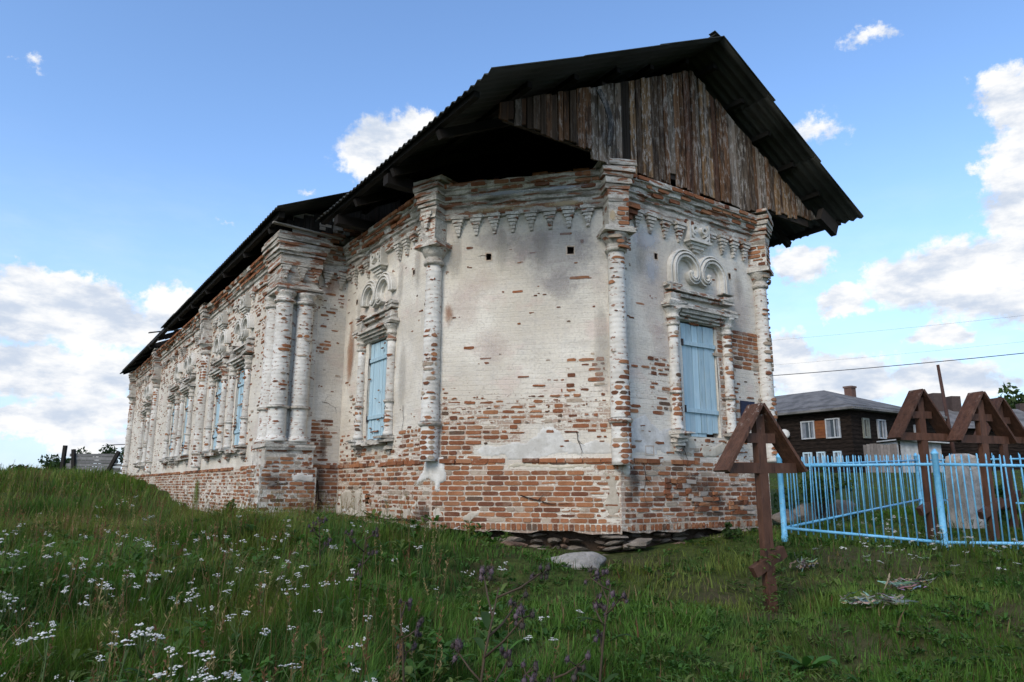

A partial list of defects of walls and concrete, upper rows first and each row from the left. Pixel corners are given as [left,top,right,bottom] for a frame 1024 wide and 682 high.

peeling [121,173,778,532]